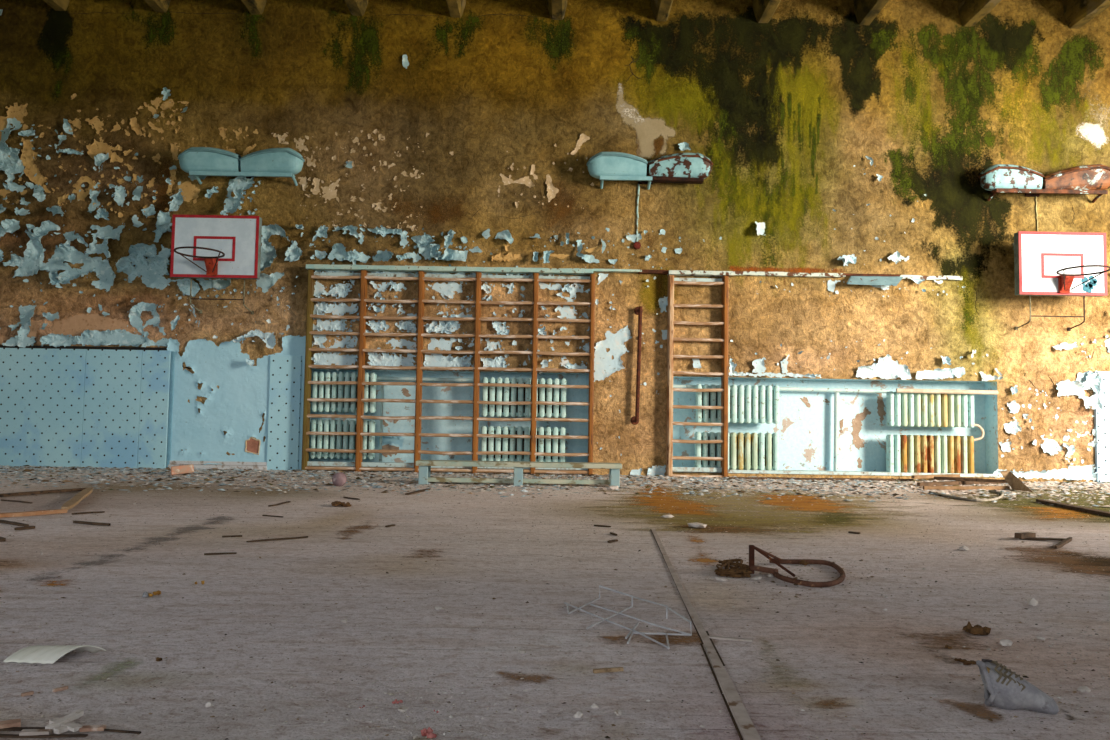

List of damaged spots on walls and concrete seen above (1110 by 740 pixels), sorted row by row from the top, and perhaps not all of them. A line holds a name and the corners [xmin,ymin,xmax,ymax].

leakage [615,3,903,268]
leakage [880,13,1045,329]
leakage [1077,101,1110,148]
peeling [0,87,682,476]
leakage [640,269,675,314]
peeling [755,221,765,236]
peeling [880,251,909,264]
peeling [728,344,821,378]
peeling [839,393,886,468]
peeling [856,335,1110,481]
leakage [588,485,905,565]
leakage [1006,547,1110,582]